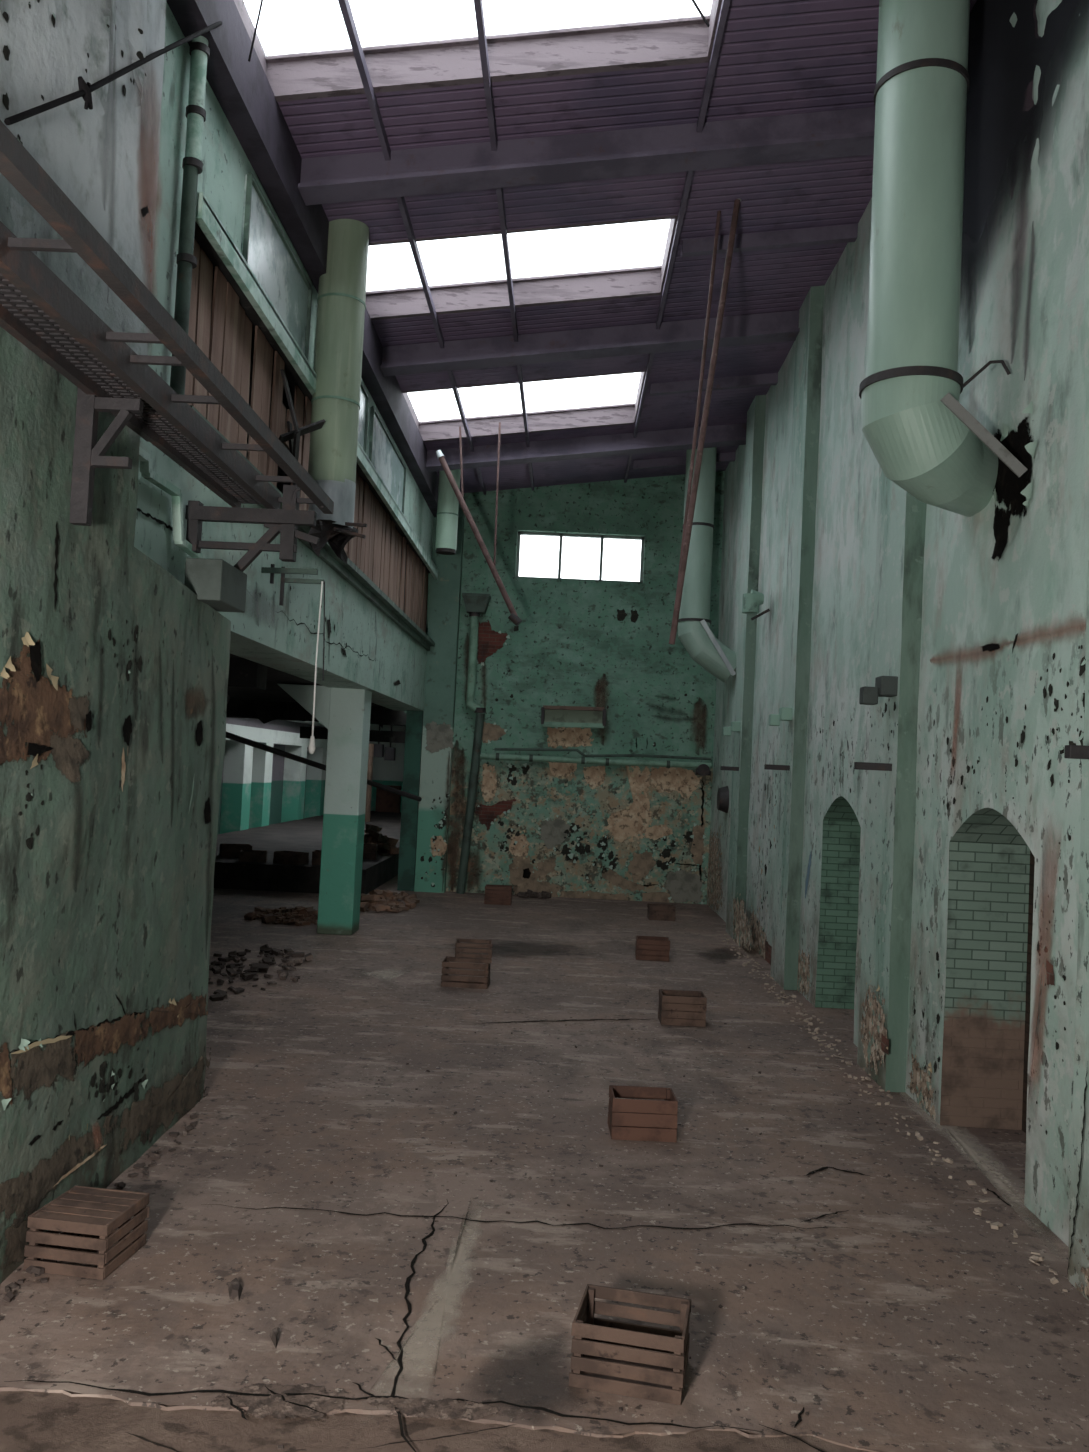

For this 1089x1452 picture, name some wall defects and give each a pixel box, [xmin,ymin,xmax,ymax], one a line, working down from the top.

peeling [26,824,39,850]
flaking render [0,632,101,816]
flaking render [477,620,510,666]
flaking render [547,727,606,789]
flaking render [475,763,777,965]
flaking render [0,992,211,1268]
crack [6,1200,864,1452]